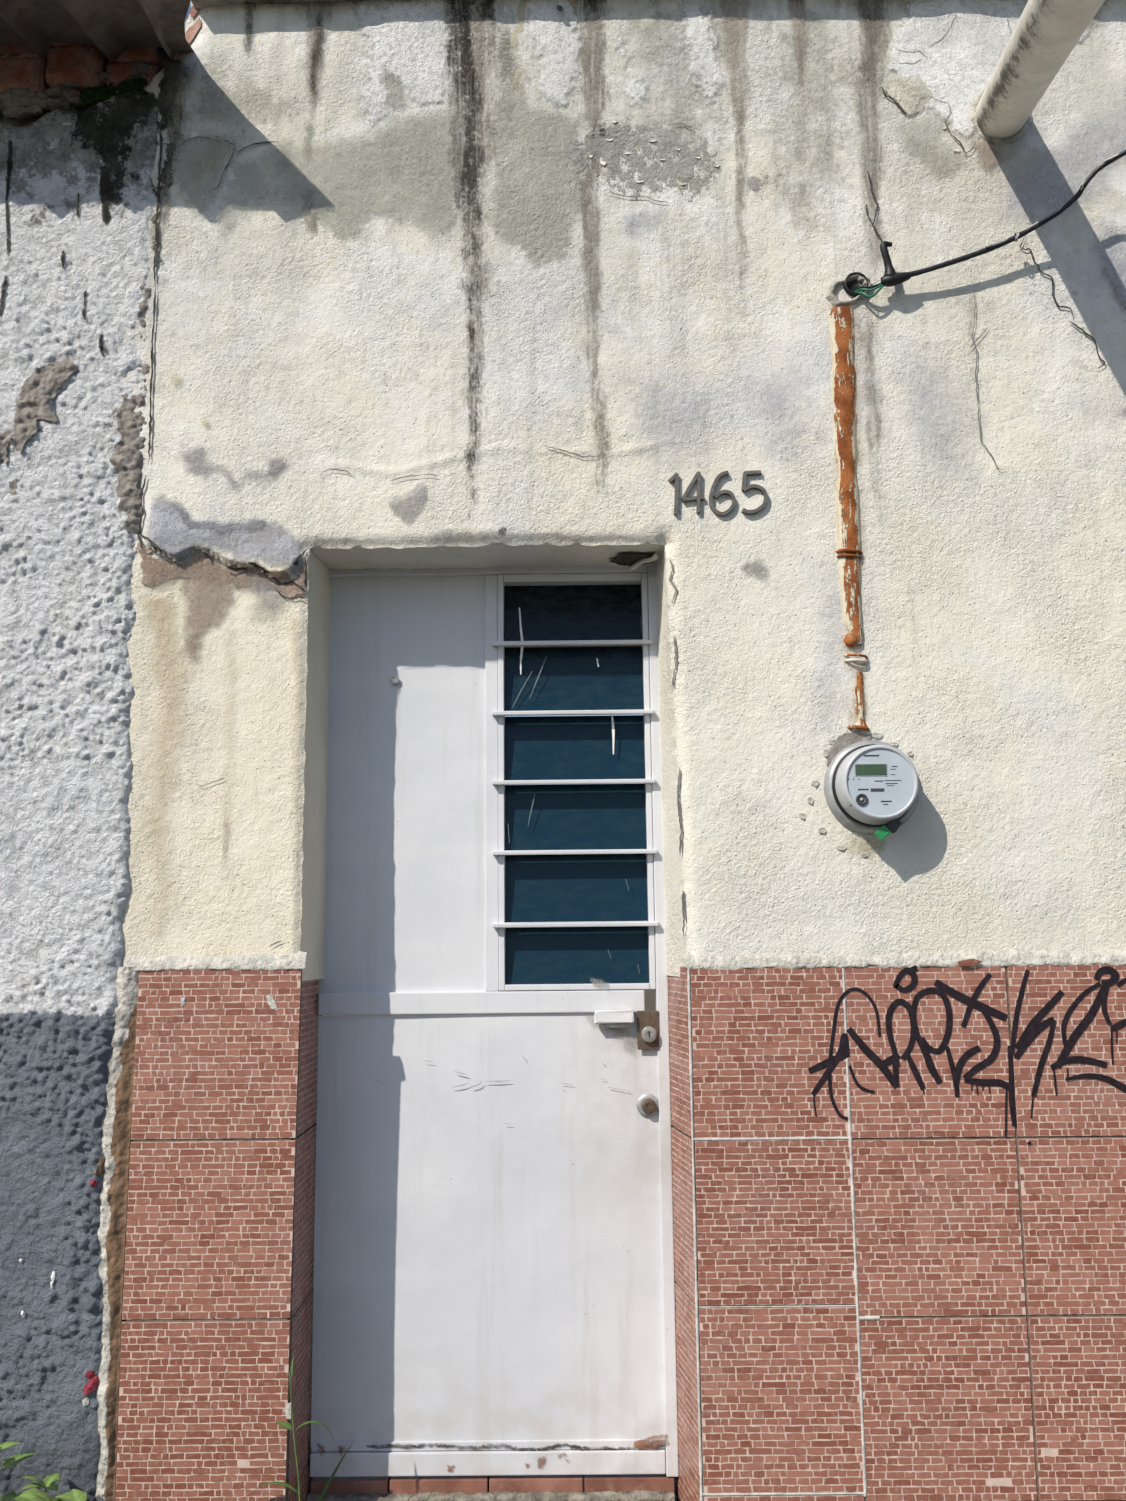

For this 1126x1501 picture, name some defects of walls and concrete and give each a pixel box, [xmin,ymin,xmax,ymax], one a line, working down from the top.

peeling [883,0,1027,173]
damp [52,47,268,264]
damp [297,0,606,471]
spalling [138,281,152,341]
crack [1019,236,1105,368]
spalling [0,358,76,463]
spalling [107,363,305,598]
damp [184,448,285,486]
damp [391,482,425,519]
damp [587,341,608,482]
damp [153,562,232,658]